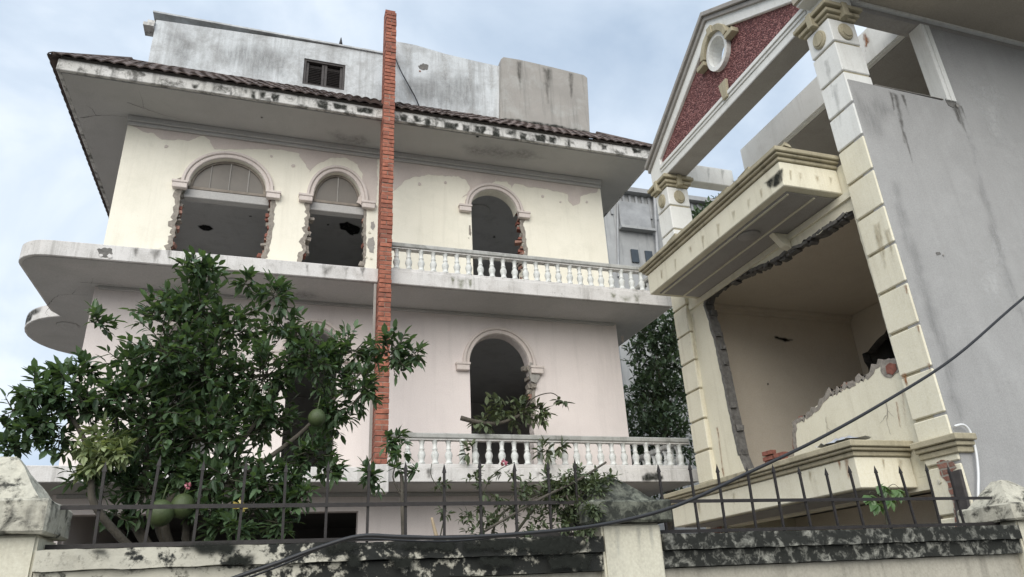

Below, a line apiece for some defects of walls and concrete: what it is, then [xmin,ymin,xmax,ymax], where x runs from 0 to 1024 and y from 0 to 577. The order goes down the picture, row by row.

peeling [133,126,378,268]
peeling [393,161,598,206]
spalling [97,248,113,258]
spalling [514,209,528,279]
spalling [703,212,855,456]
spalling [792,358,899,449]
water stain [183,542,253,565]
water stain [326,534,592,571]